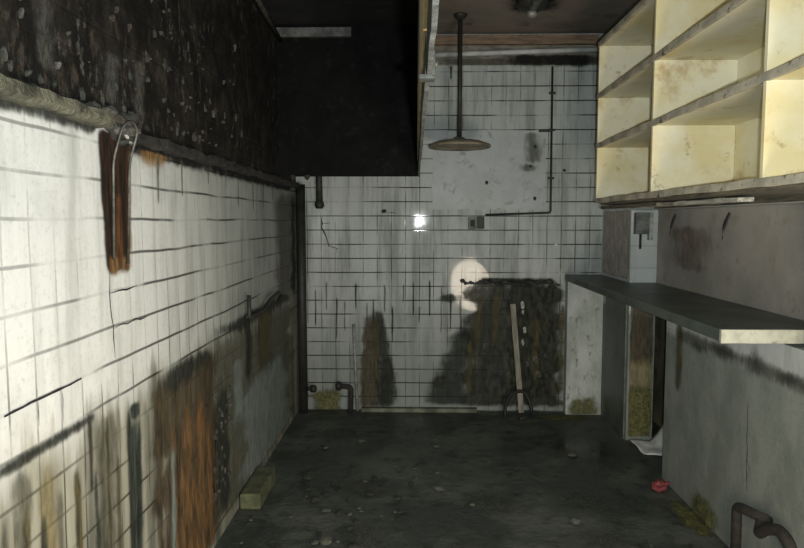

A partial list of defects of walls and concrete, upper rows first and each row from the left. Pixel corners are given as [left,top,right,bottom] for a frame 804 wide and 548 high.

leakage [107,56,117,102]
corrosion [99,130,132,274]
leakage [361,286,397,407]
leakage [403,280,431,319]
leakage [427,278,565,406]
leakage [676,325,804,391]
leakage [0,403,143,548]
corrosion [153,352,218,548]